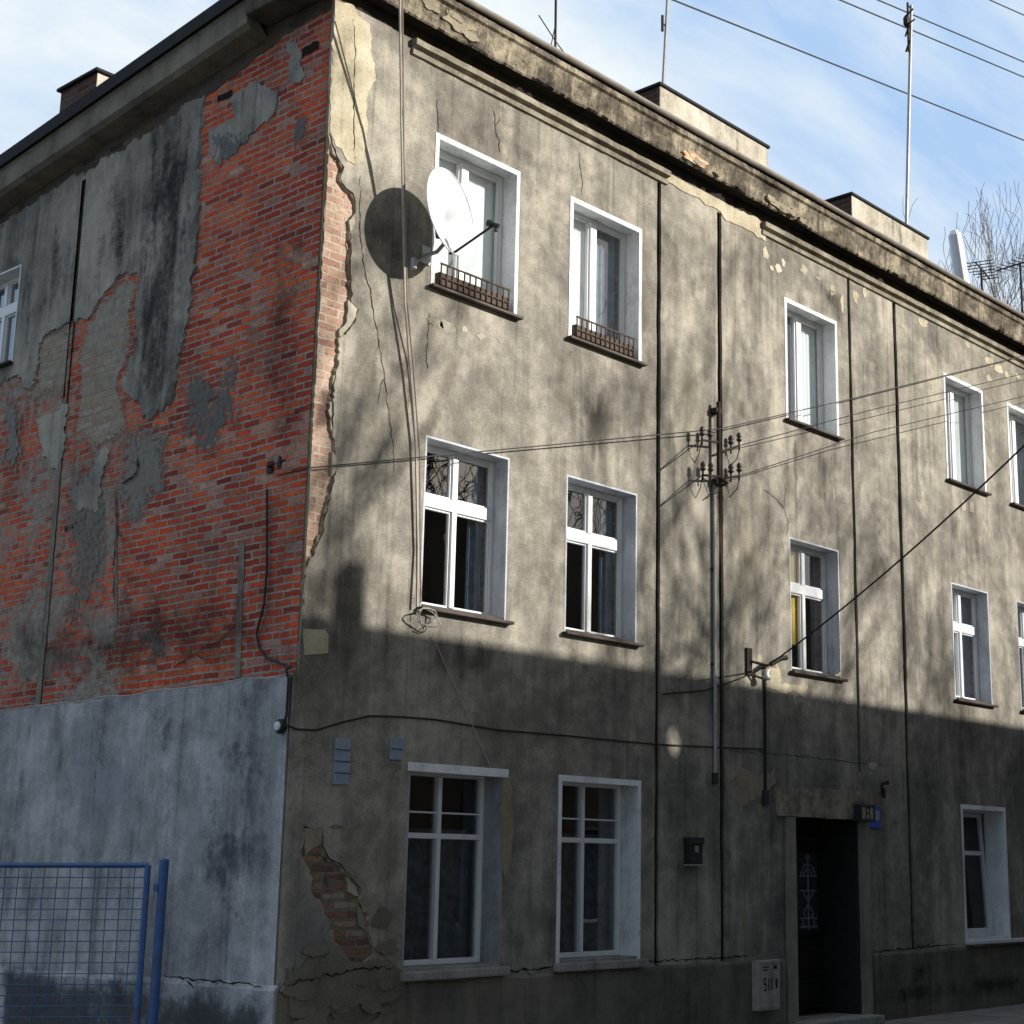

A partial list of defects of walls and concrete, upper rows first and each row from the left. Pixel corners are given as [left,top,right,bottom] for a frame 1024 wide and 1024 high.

peeling [422,0,480,43]
peeling [682,151,703,167]
crack [353,19,394,476]
peeling [667,176,785,273]
peeling [800,264,867,313]
flaking render [0,0,376,710]
flaking render [301,824,374,963]
crack [164,975,262,988]